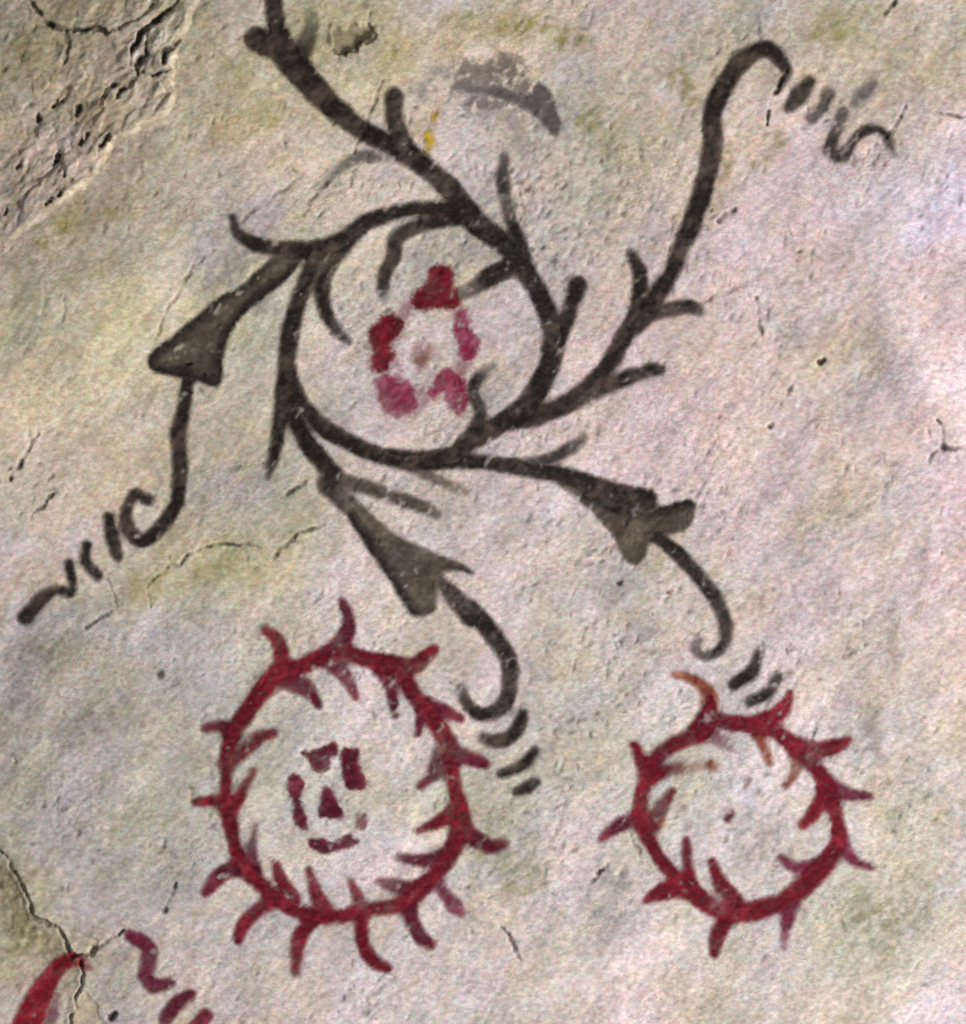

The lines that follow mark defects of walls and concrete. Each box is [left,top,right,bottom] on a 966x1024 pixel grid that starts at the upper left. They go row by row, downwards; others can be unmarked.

peeling [0,0,200,258]